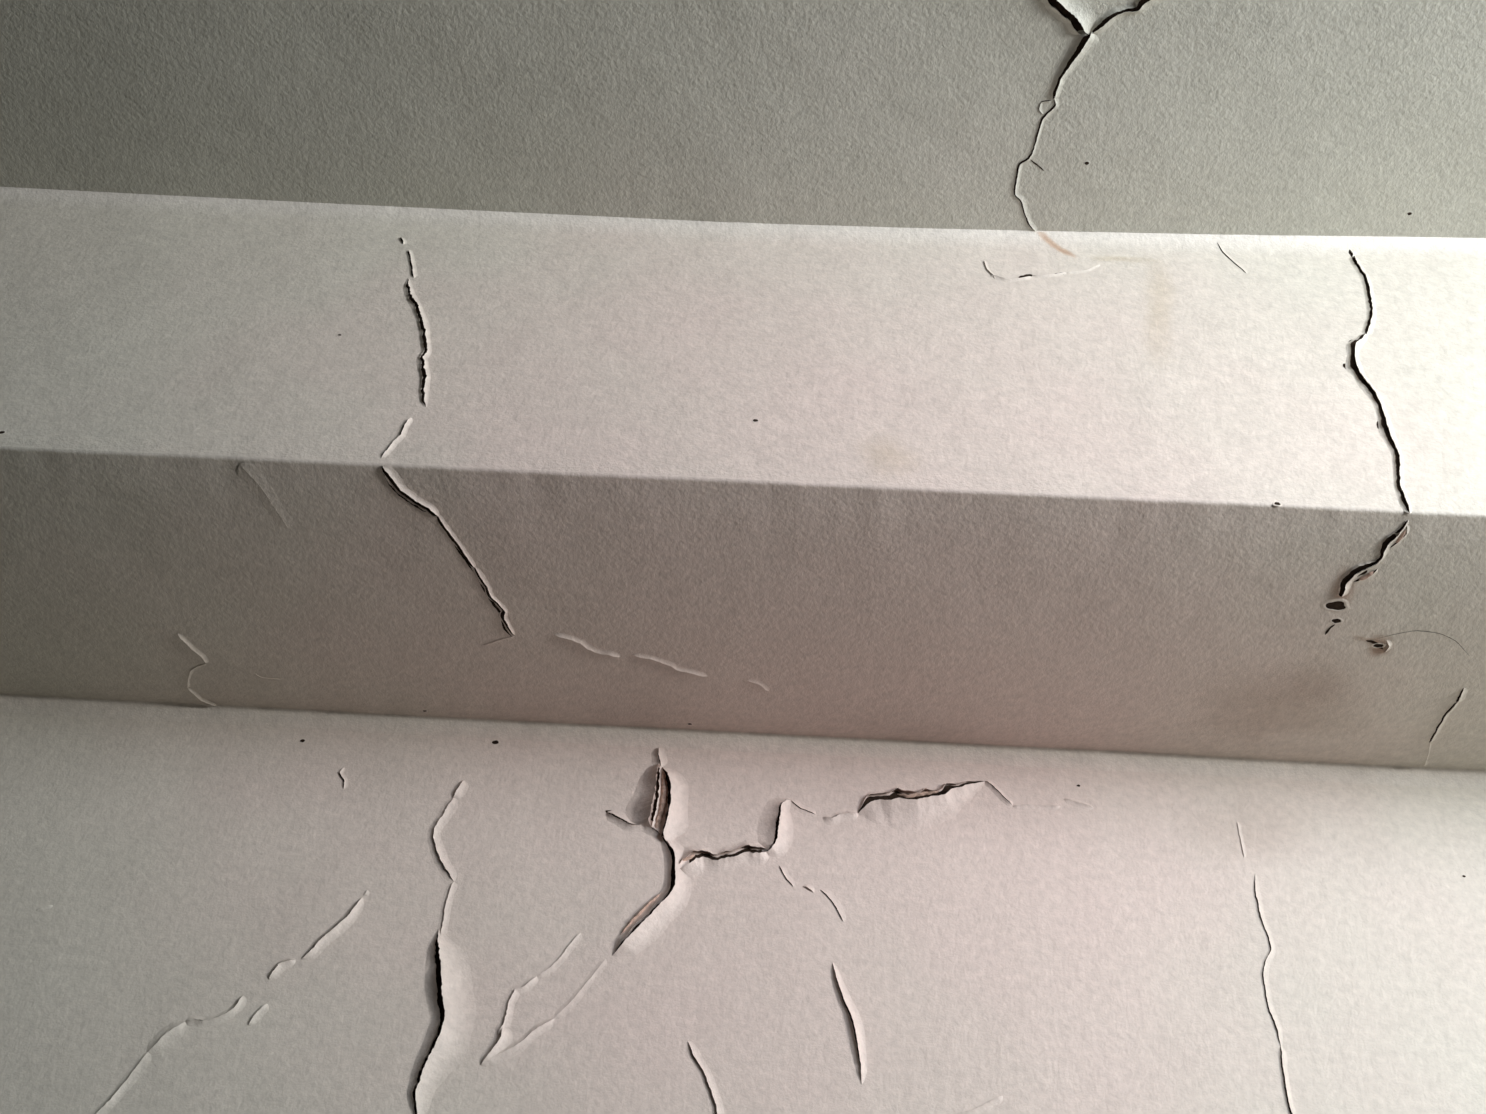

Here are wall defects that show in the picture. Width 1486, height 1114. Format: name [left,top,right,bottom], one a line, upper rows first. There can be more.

crack [1012,0,1167,231]
crack [1217,242,1247,273]
crack [381,237,515,646]
crack [1320,250,1412,635]
crack [554,633,708,677]
crack [746,679,770,691]
crack [91,890,370,1114]
peeling [407,780,477,1114]
peeling [606,747,1093,957]
crack [1237,822,1297,1114]